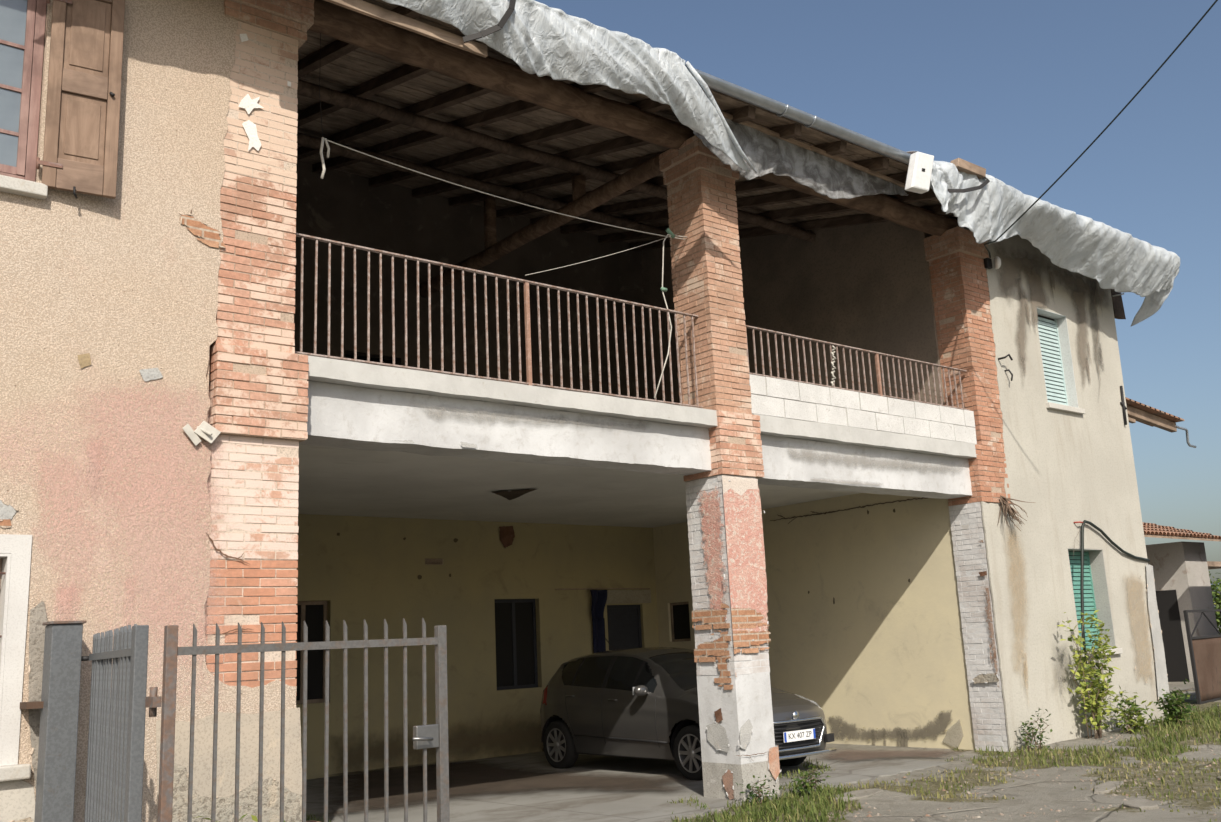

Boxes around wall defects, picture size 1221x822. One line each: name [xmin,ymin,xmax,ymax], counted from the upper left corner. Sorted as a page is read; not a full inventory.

flaking render [180,213,225,248]
water stain [997,249,1106,380]
peeling [0,500,18,528]
peeling [691,475,771,690]
peeling [706,708,753,752]
water stain [828,711,951,747]
spalling [768,746,781,782]
spalling [722,769,734,800]